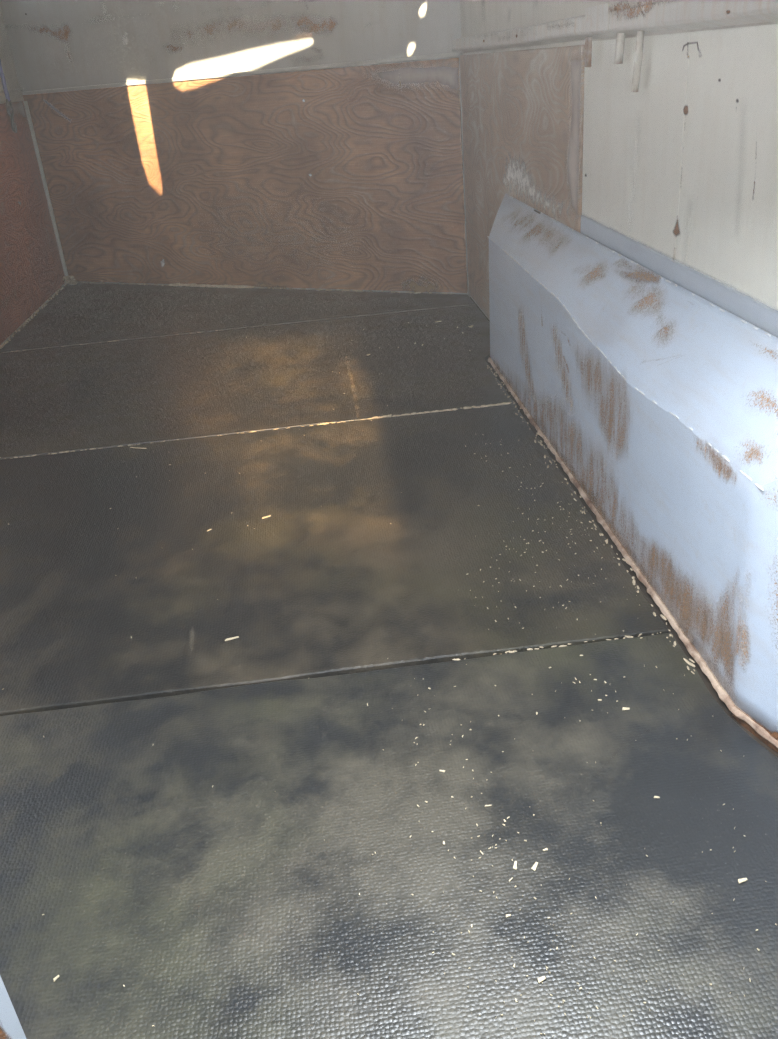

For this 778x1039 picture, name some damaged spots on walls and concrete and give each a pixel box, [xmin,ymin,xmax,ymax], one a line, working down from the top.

rust [620,261,660,309]
rust [497,315,748,678]
rust [732,709,778,753]